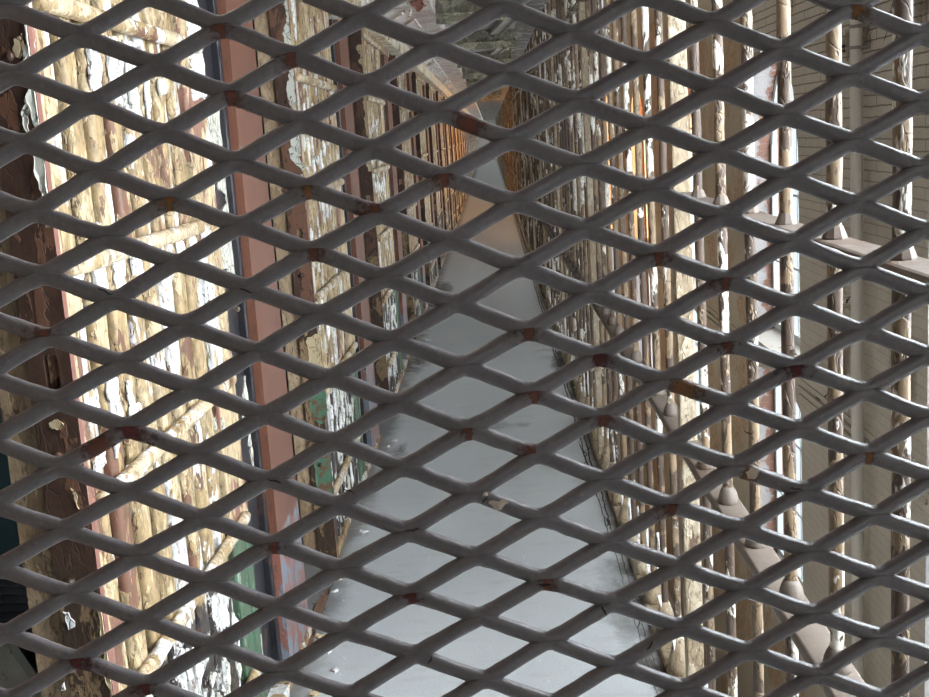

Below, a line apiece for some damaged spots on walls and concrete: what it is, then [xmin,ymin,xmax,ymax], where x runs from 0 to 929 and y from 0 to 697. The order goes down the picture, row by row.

peeling [186,21,201,36]
peeling [86,48,136,91]
peeling [188,53,205,75]
peeling [113,77,168,119]
peeling [191,89,207,101]
rust [453,112,486,138]
peeling [196,284,215,307]
peeling [89,377,141,416]
rust [668,379,705,400]
rust [81,426,160,459]
peeling [218,593,239,629]
peeling [180,657,242,697]